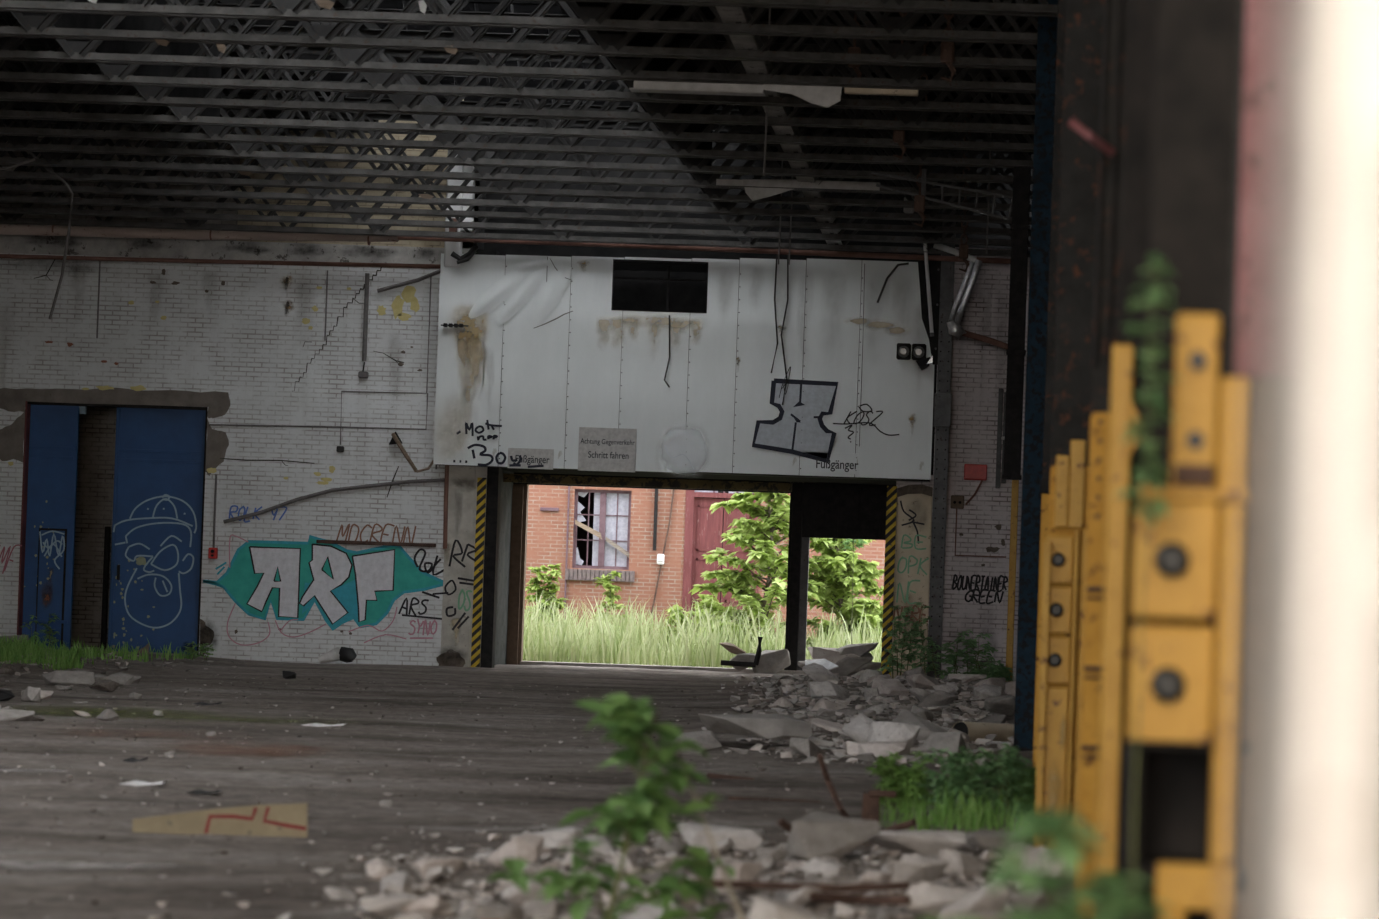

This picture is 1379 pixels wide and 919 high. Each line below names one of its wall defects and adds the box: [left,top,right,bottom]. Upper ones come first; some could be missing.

crack [294,267,382,391]
spalling [0,385,230,476]